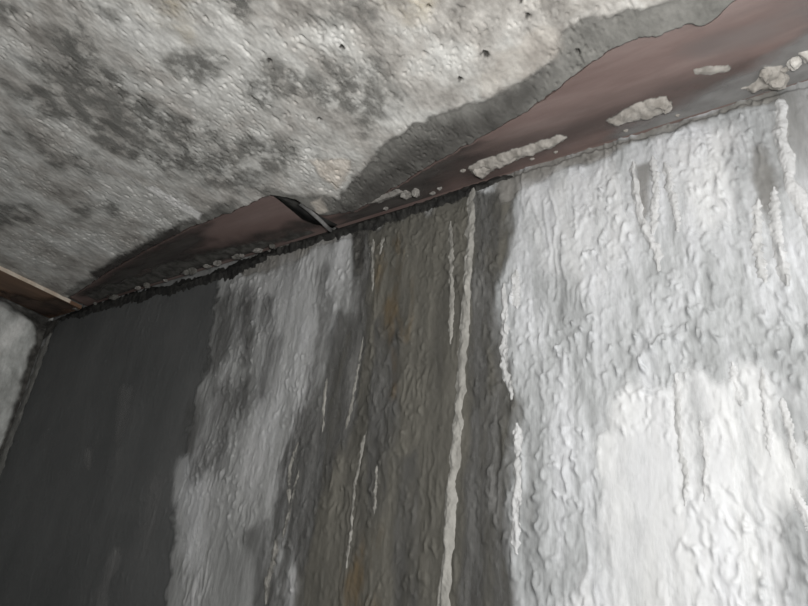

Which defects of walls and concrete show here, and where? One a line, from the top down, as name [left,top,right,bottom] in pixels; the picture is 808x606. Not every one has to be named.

flaking render [241,233,353,276]
spalling [312,199,327,214]
flaking render [496,90,778,213]
damp [629,132,733,272]
damp [750,98,808,287]
damp [263,187,523,606]
damp [572,361,808,606]